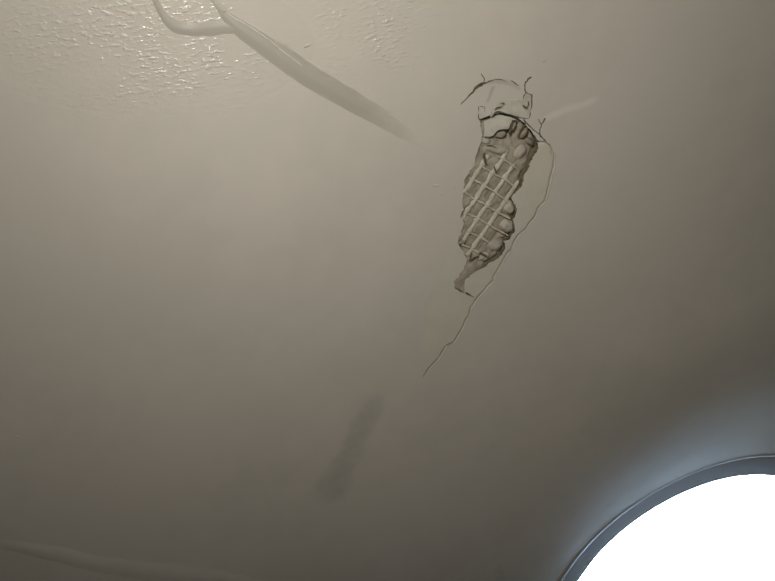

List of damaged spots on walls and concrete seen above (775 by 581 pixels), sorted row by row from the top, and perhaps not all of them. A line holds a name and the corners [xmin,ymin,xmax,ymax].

spalling [421,93,556,377]